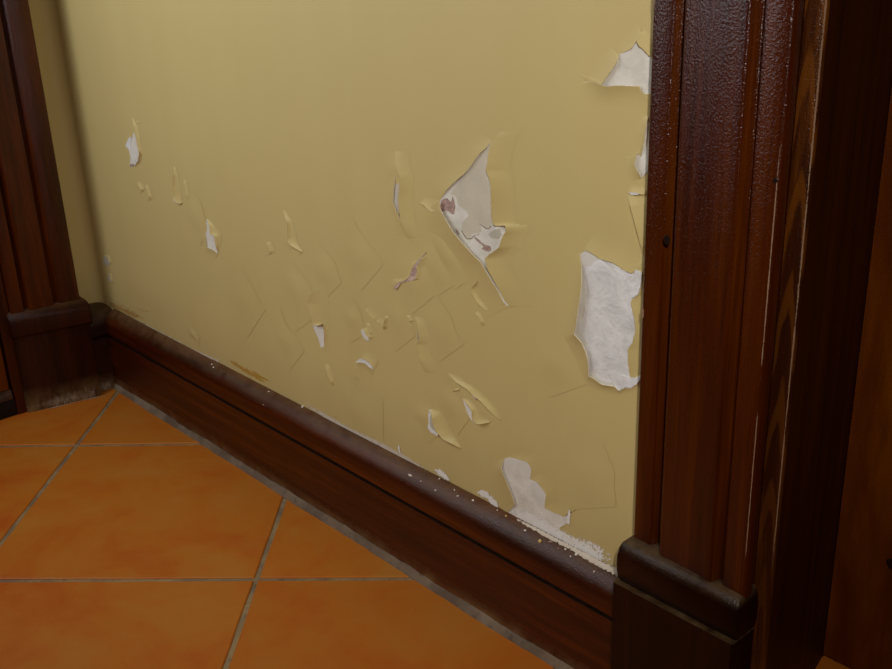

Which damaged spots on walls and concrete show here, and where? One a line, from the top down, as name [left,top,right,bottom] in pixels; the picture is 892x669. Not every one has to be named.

peeling [125,118,142,167]
peeling [203,219,222,259]
peeling [417,130,533,325]
peeling [561,19,653,396]
peeling [449,374,503,425]
peeling [428,408,462,448]
peeling [489,451,576,531]